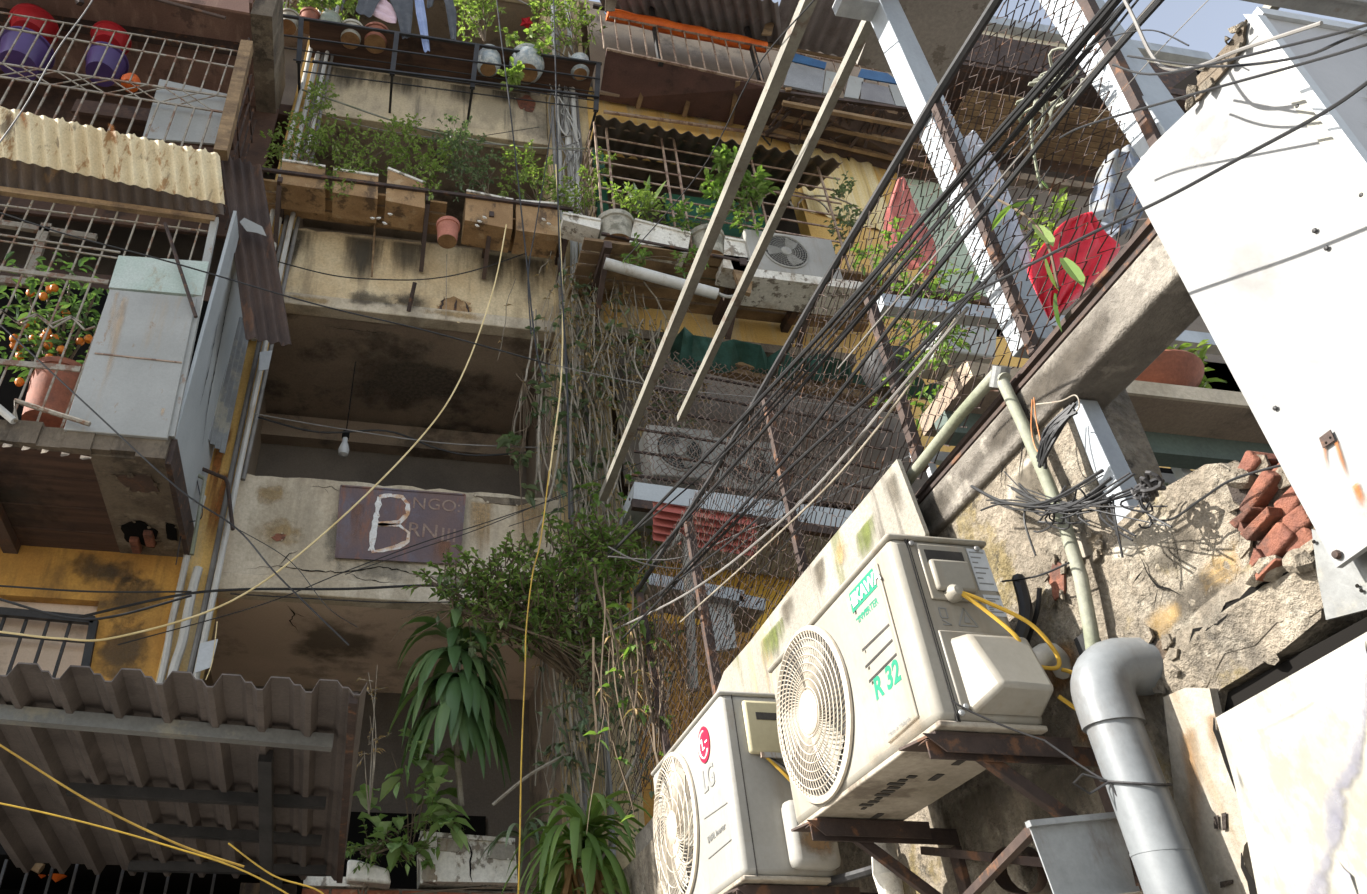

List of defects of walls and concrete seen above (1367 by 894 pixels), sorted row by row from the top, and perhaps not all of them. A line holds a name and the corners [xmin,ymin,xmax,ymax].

leakage [288,230,305,262]
leakage [347,237,422,272]
leakage [483,255,503,283]
leakage [353,292,420,305]
rust [1319,430,1345,469]
spalling [1215,450,1316,587]
crack [1133,557,1180,605]
crack [1190,571,1289,641]
leakage [100,633,145,677]
leakage [299,627,370,656]
rust [802,832,832,853]